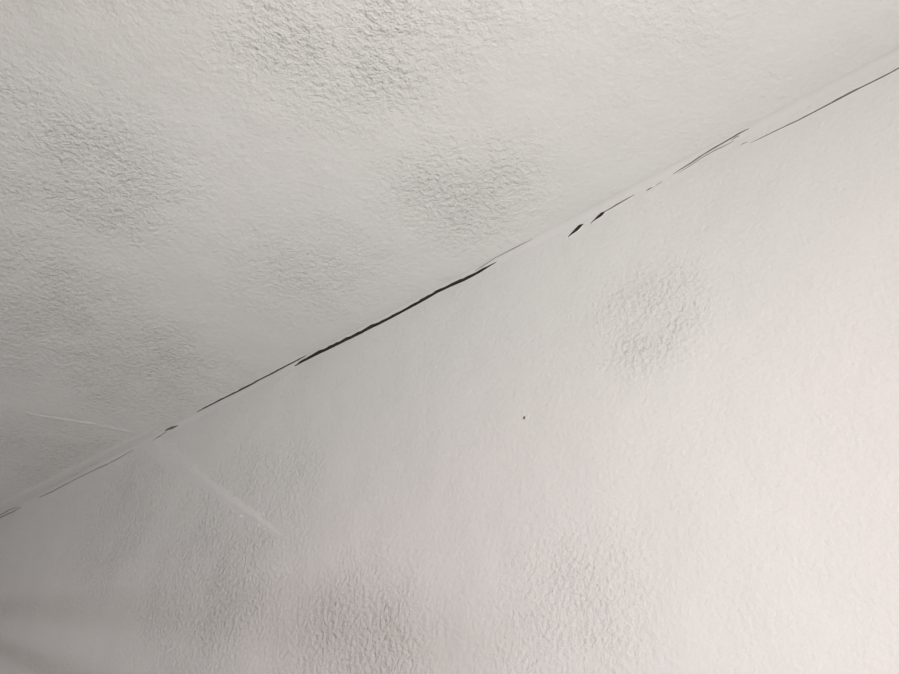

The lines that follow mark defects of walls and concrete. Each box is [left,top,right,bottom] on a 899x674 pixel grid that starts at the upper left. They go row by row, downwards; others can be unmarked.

crack [673,68,899,175]
crack [196,239,532,412]
crack [0,425,178,518]